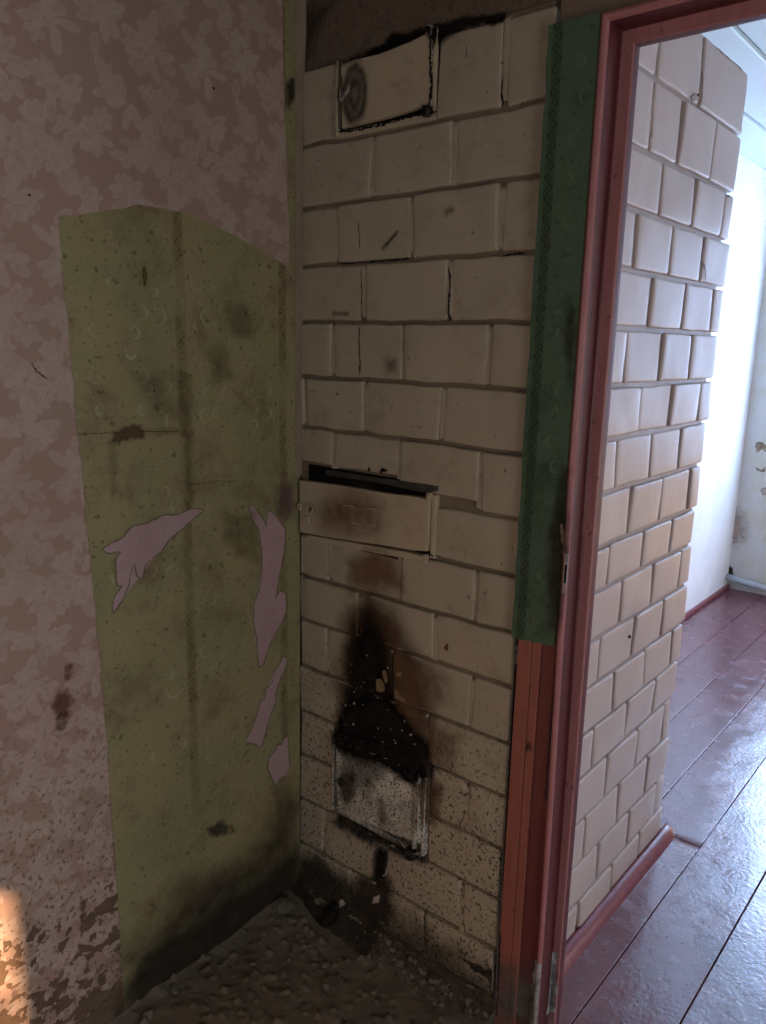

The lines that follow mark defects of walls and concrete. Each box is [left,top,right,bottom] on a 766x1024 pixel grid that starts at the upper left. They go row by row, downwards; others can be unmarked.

crack [445,268,453,321]